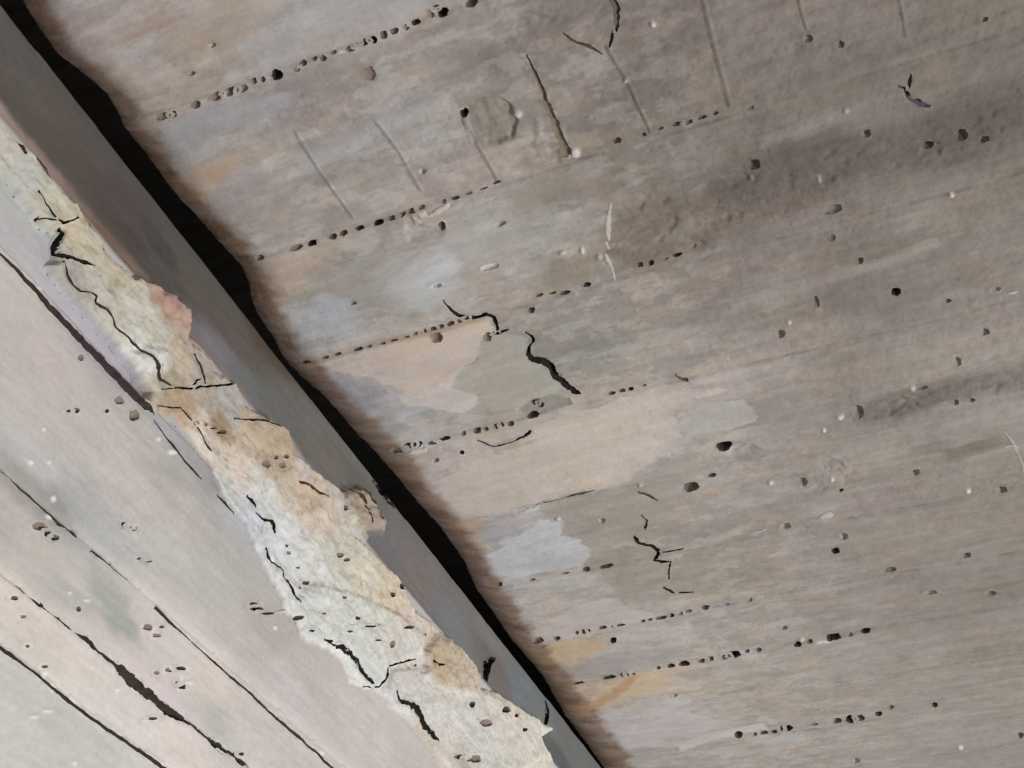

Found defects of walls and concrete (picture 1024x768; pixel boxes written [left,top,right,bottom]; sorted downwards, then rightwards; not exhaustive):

crack [34,190,237,453]
crack [441,300,582,396]
spalling [526,280,594,316]
flaking render [0,119,554,768]
crack [299,479,329,499]
crack [479,428,532,448]
peeling [385,382,730,517]
crack [246,495,302,603]
crack [632,490,694,595]
crack [324,637,445,742]